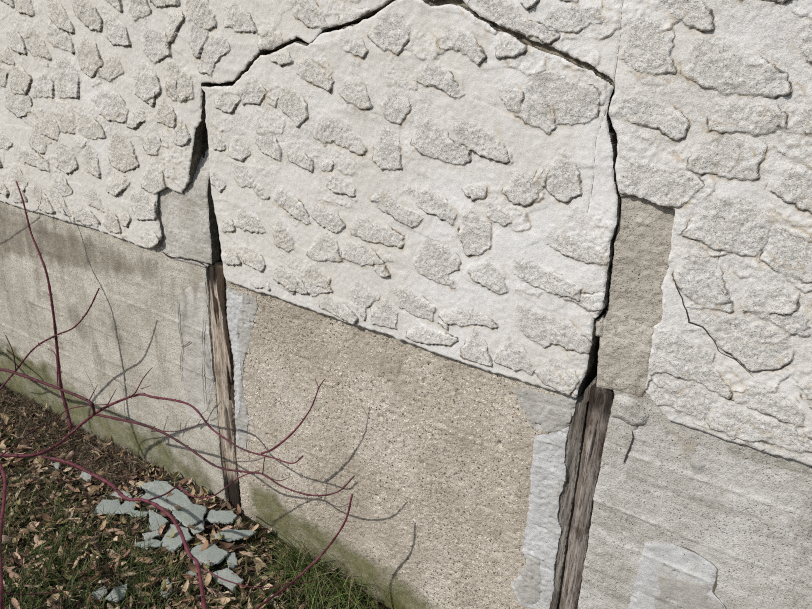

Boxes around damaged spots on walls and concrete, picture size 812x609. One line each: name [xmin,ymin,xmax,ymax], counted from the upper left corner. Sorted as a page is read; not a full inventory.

crack [428,0,623,86]
spalling [159,148,220,268]
crack [201,127,209,159]
crack [587,112,618,213]
crack [162,252,207,267]
peeling [226,286,258,451]
crack [586,337,600,378]
spalling [595,196,675,426]
crack [673,277,753,377]
peeling [511,387,578,609]